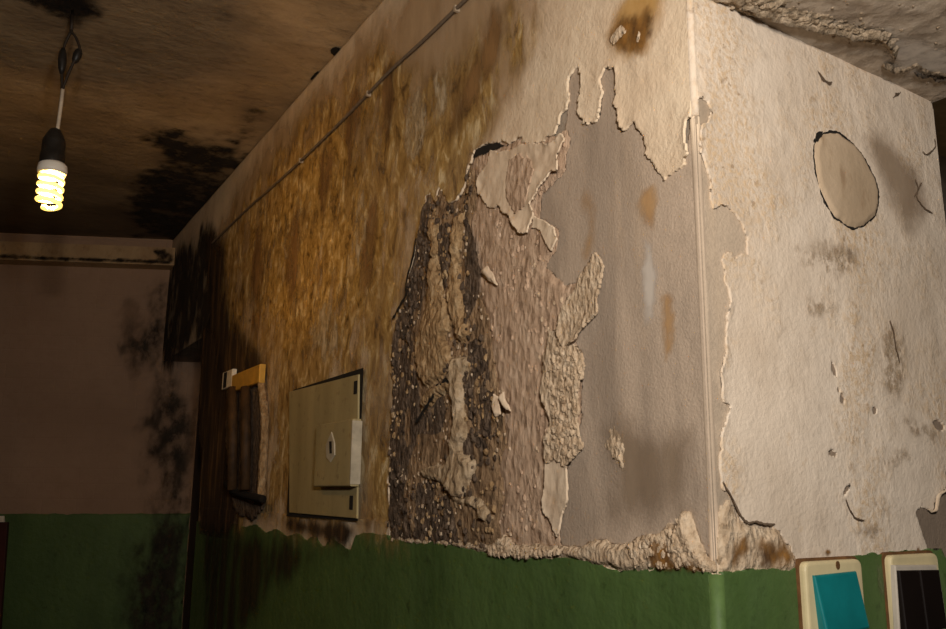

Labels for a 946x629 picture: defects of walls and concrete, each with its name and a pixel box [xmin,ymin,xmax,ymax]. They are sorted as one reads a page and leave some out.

corrosion [610,0,659,53]
spalling [712,0,946,83]
leakage [129,0,528,537]
peeling [387,67,796,574]
peeling [884,334,903,392]
peeling [916,489,946,557]